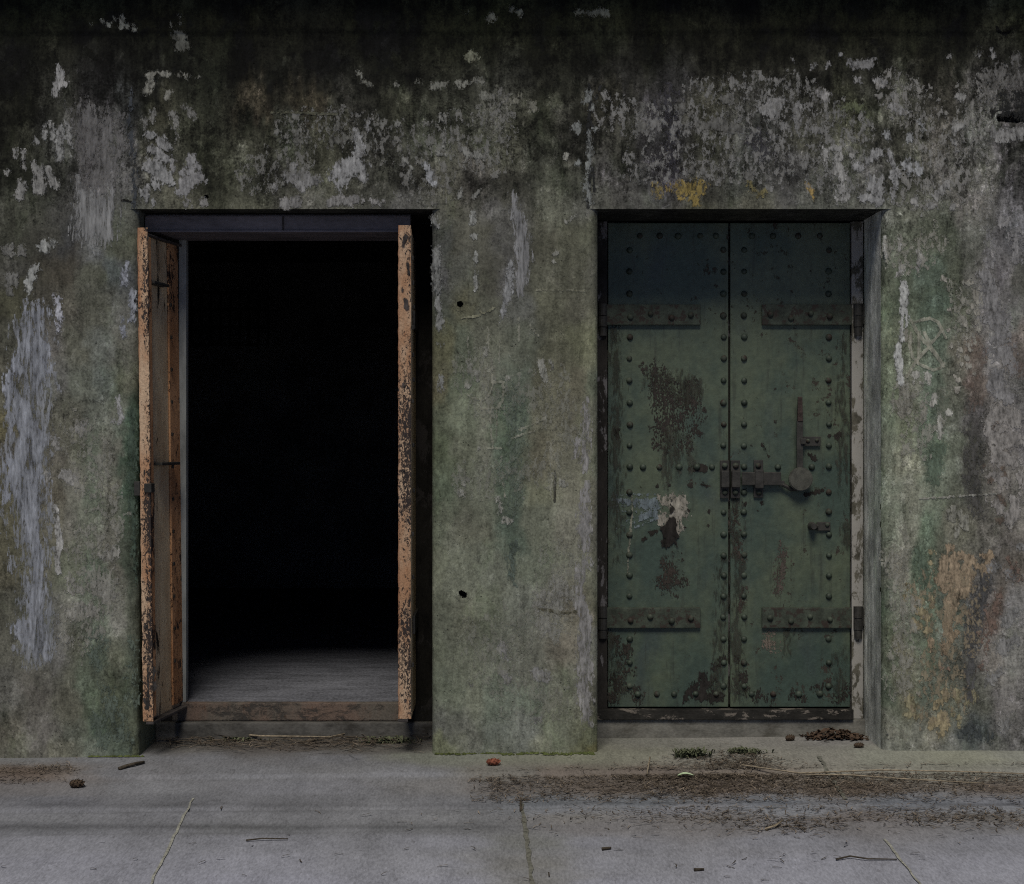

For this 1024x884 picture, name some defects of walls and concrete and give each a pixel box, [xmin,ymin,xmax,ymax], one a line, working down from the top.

peeling [3,120,73,202]
peeling [51,63,70,98]
peeling [121,71,208,210]
peeling [590,47,1024,534]
leakage [0,294,64,670]
rust [607,325,709,599]
rust [682,498,775,706]
leakage [958,568,994,745]